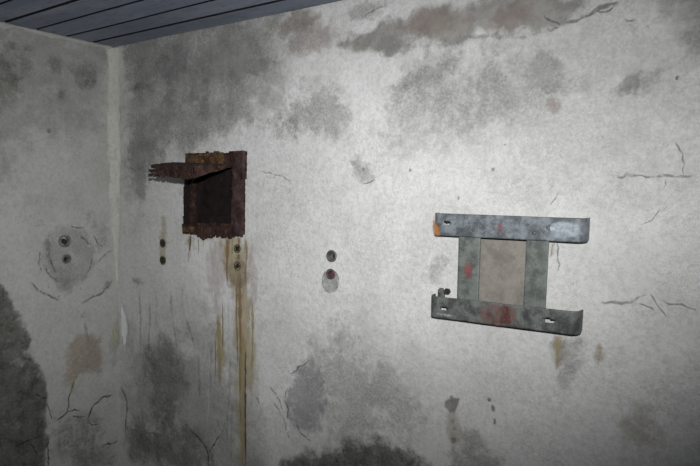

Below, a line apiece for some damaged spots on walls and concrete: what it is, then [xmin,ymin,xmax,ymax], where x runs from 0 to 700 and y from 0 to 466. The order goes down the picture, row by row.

damp [0,286,48,466]
corrosion [215,304,224,373]
corrosion [224,237,254,456]
damp [281,440,421,466]